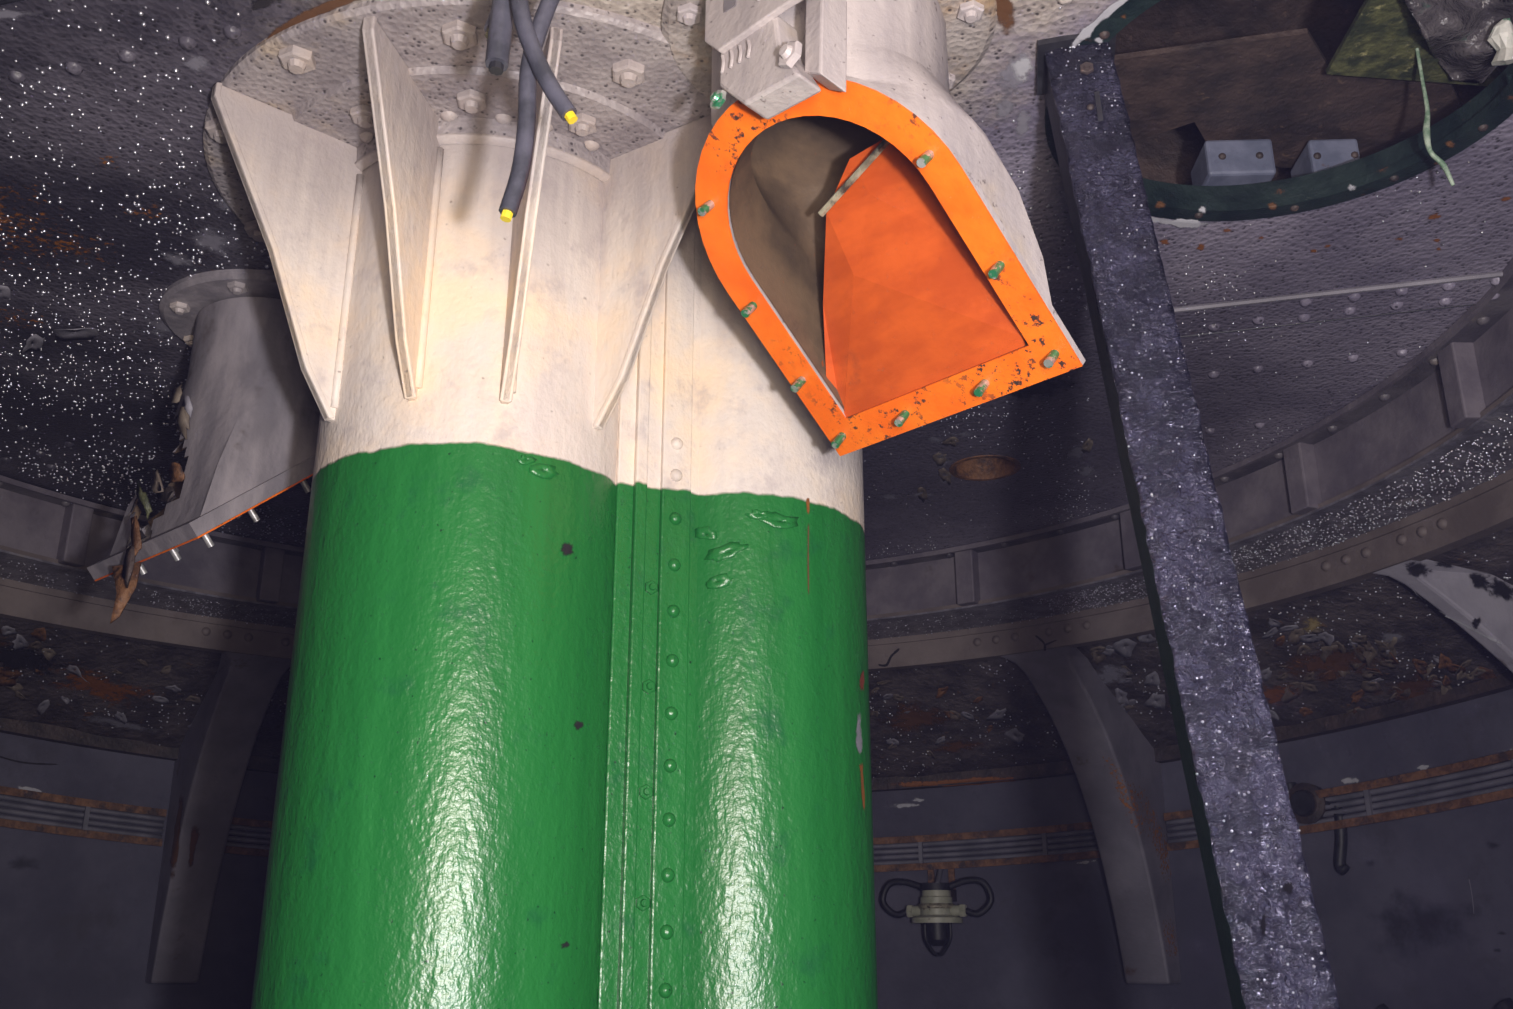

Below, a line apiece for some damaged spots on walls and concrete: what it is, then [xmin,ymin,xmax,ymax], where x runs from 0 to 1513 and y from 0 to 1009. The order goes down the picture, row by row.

corrosion [996,0,1014,34]
corrosion [0,185,113,270]
peeling [1406,562,1502,644]
peeling [1470,573,1513,600]